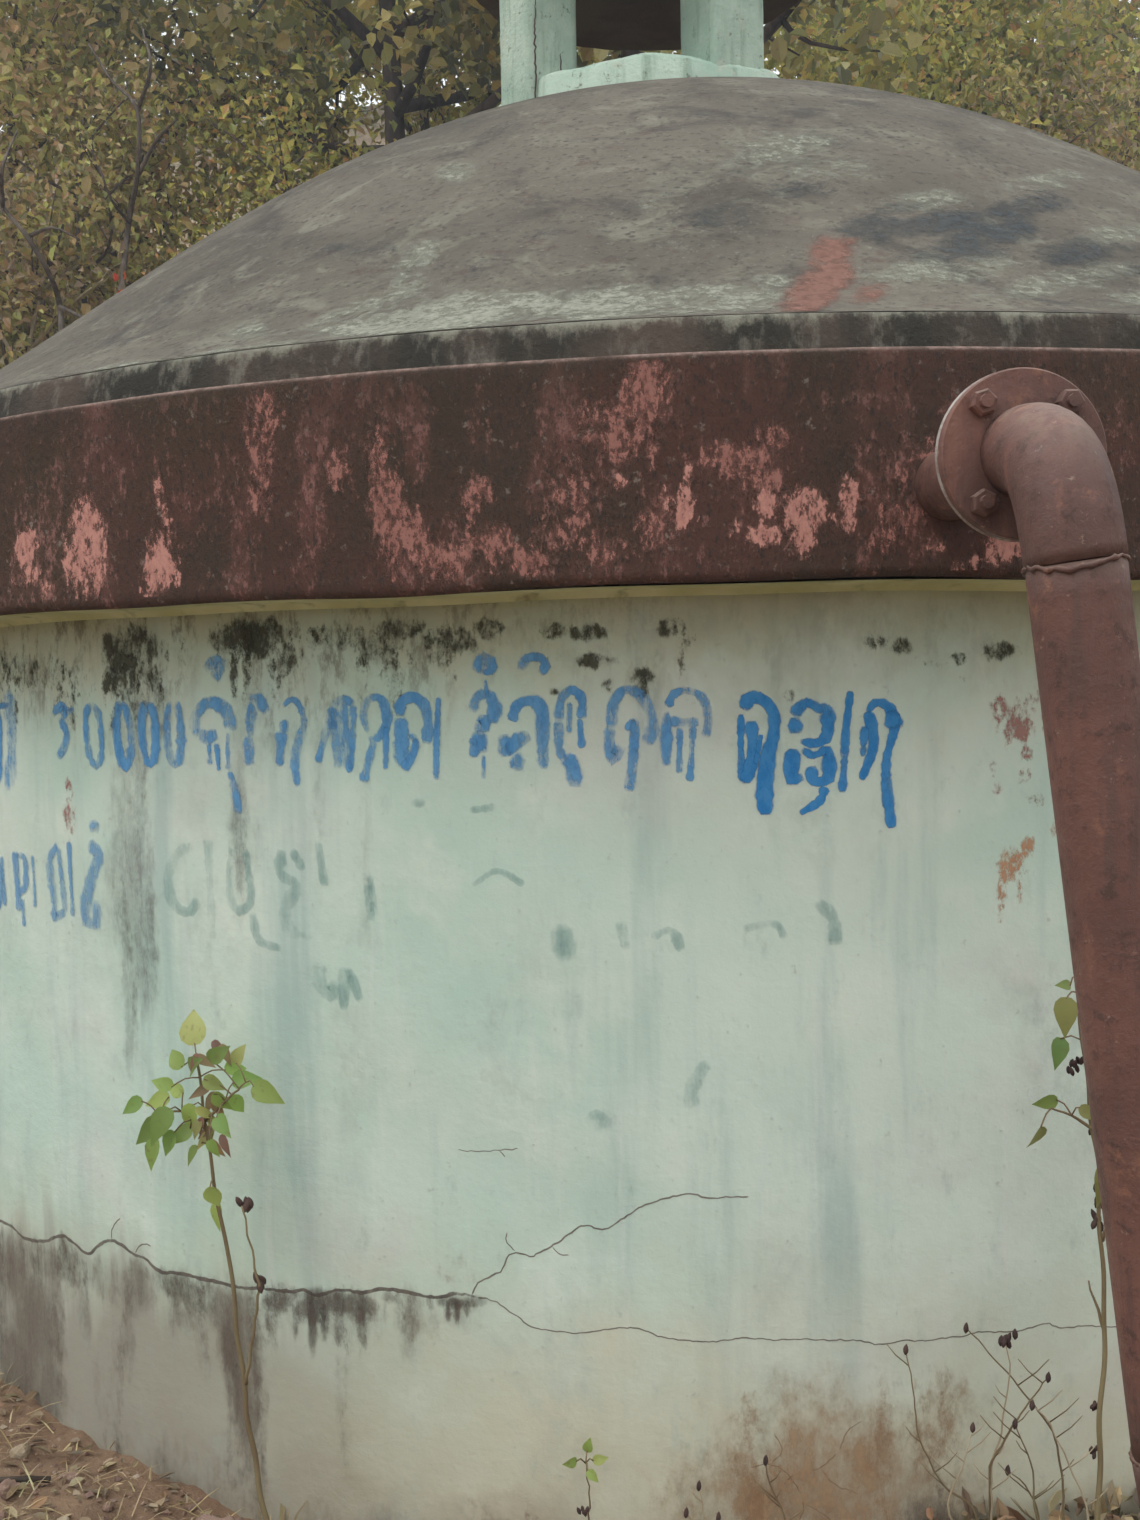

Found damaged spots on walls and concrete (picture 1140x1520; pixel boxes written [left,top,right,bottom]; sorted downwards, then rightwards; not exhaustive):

peeling [244,389,285,519]
peeling [368,360,935,583]
peeling [11,495,109,600]
peeling [139,476,181,597]
peeling [926,537,1021,570]
damp [102,623,168,728]
damp [211,616,303,696]
damp [312,618,504,677]
damp [547,622,610,691]
corrosion [994,696,1043,776]
corrosion [998,838,1034,922]
crack [0,1193,1116,1345]